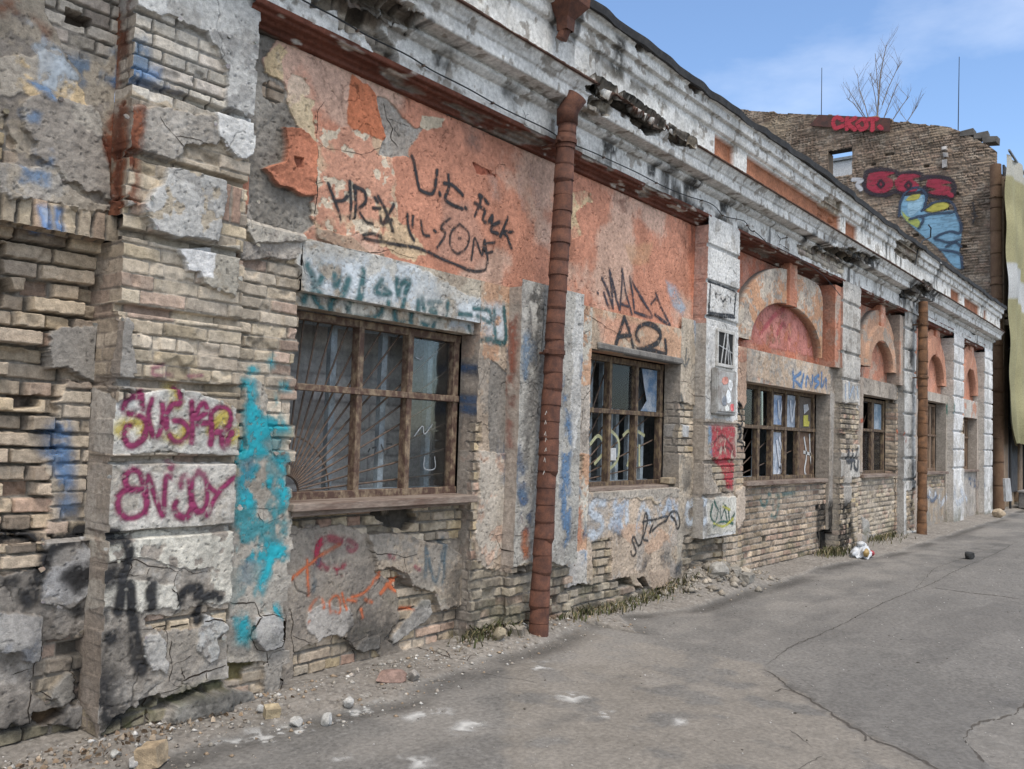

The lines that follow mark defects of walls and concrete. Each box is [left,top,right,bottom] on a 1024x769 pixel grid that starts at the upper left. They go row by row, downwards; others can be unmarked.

corrosion [115,6,126,76]
flaking render [0,90,112,200]
corrosion [103,100,145,215]
spalling [123,0,384,257]
spalling [377,96,423,158]
spalling [585,72,700,149]
flaking render [179,245,242,297]
flaking render [291,505,533,649]
spalling [591,536,649,589]
crack [89,559,310,731]
crack [765,542,1024,769]